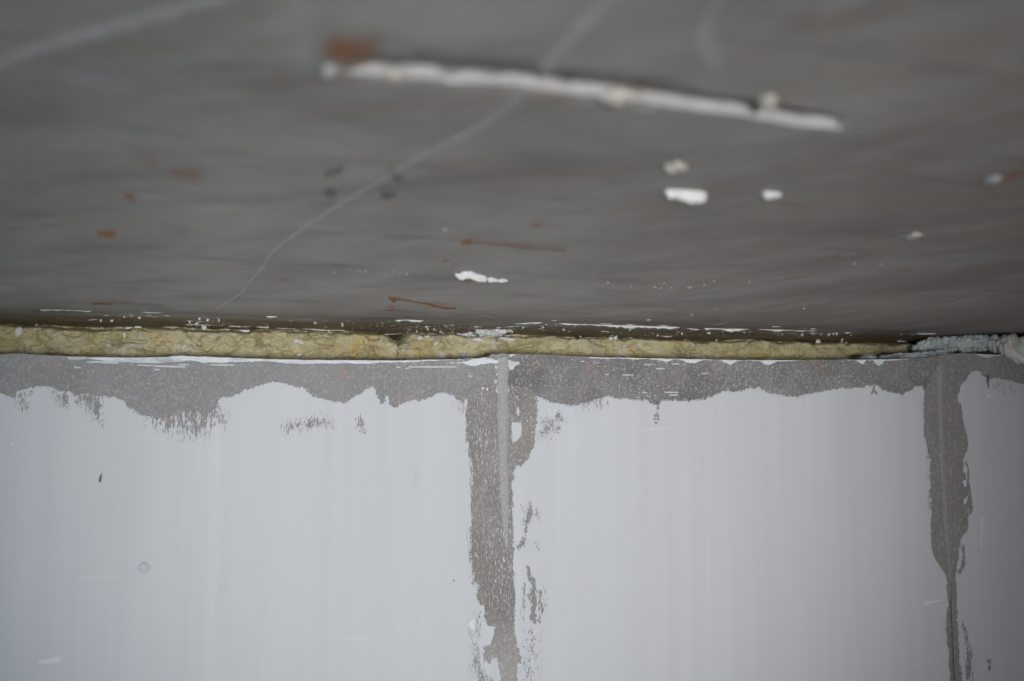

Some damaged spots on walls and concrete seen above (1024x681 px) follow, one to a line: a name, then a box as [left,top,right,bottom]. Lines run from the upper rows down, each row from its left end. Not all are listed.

rust [386,296,457,312]